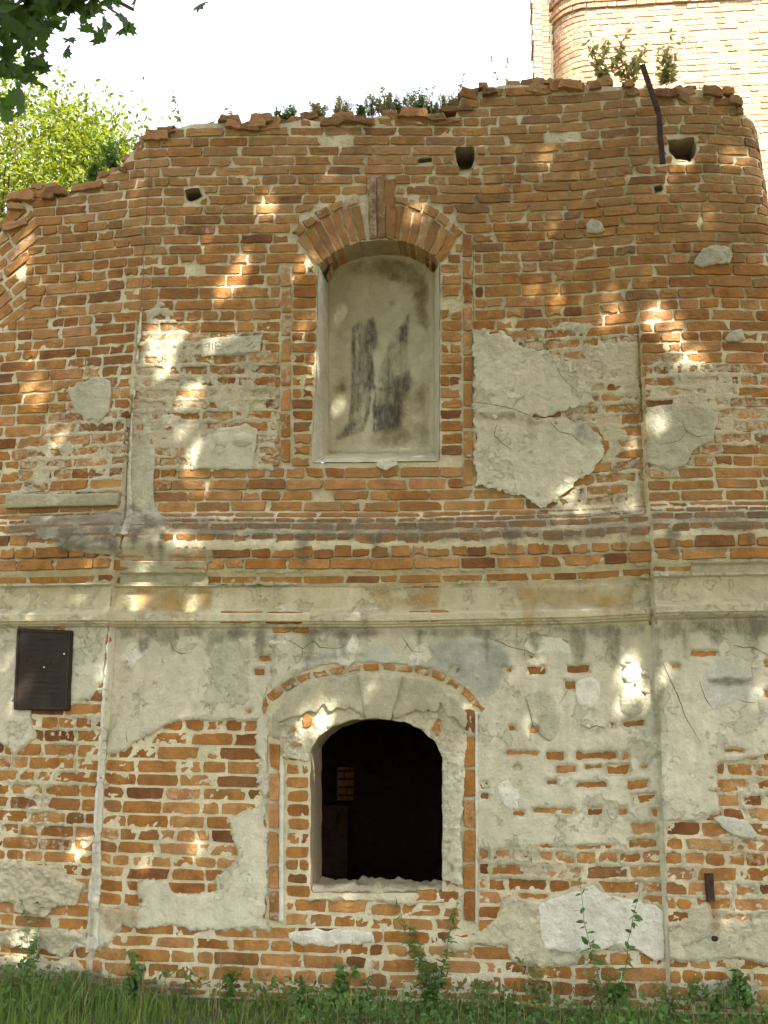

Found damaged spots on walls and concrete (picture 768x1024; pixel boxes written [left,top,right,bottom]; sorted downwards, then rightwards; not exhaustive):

crack [477,395,579,450]
damp [7,505,768,561]
spalling [669,649,720,670]
crack [662,661,713,743]
peeling [0,675,768,1014]